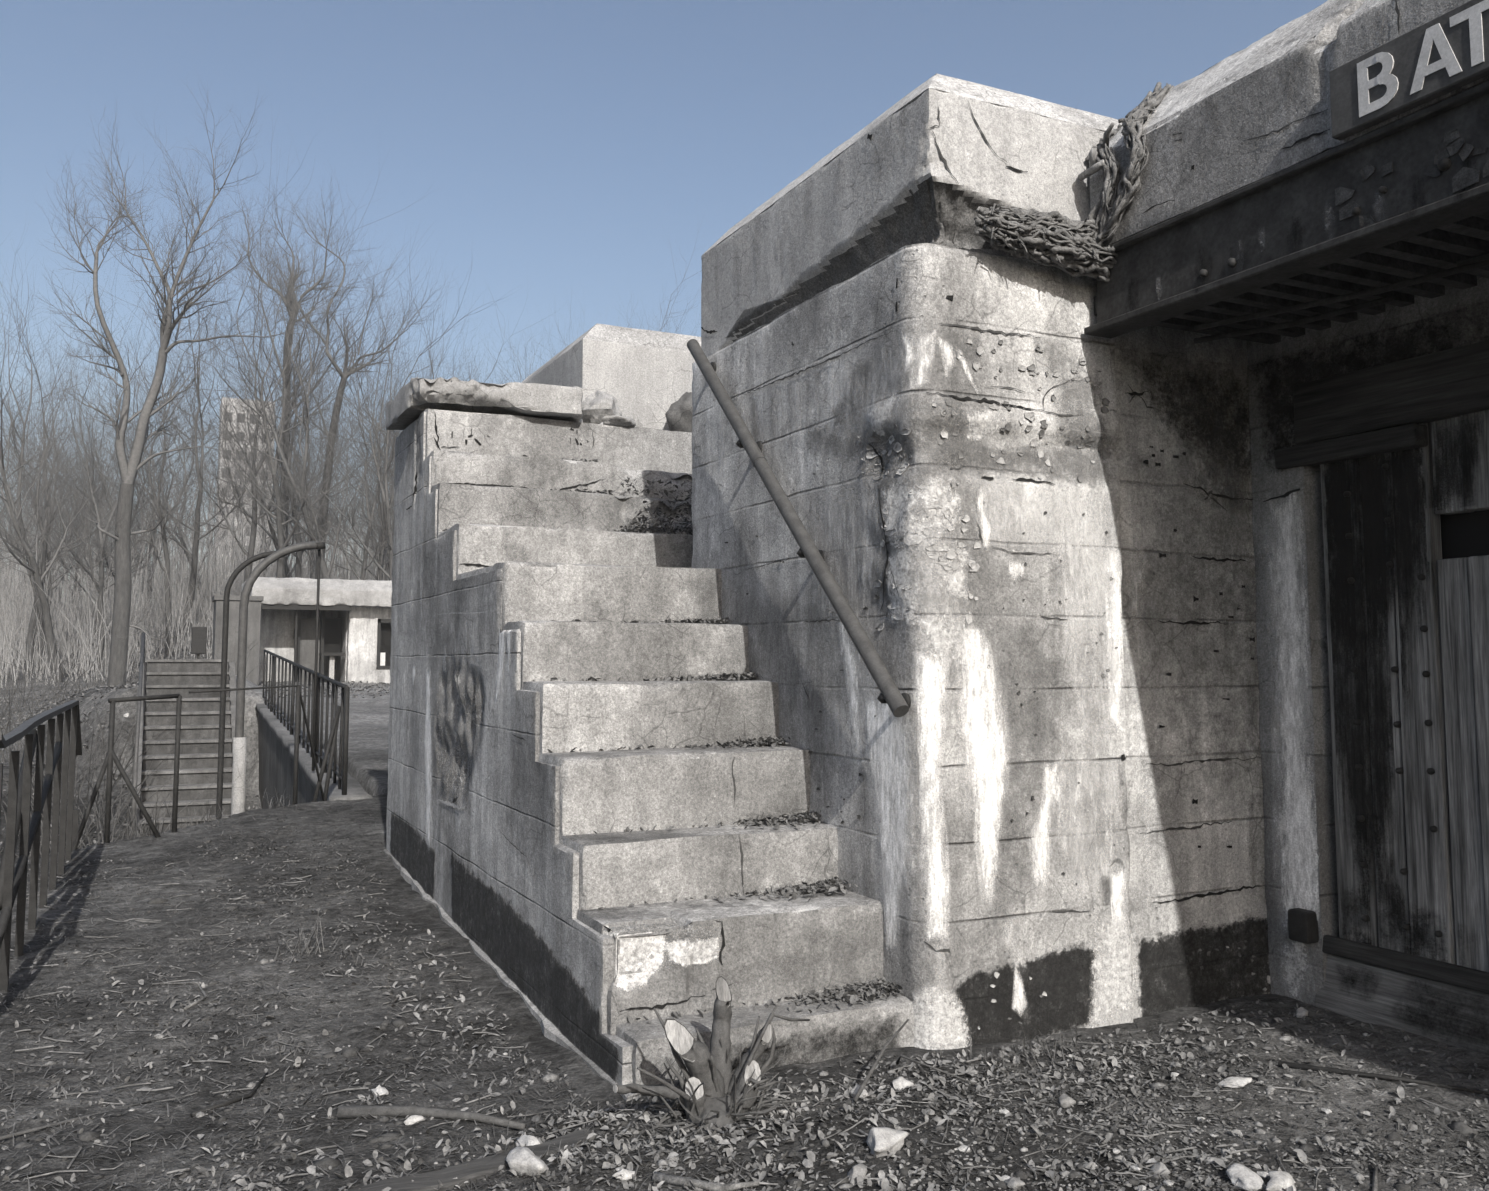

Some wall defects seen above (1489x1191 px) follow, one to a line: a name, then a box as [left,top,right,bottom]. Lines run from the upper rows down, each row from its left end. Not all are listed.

crack [1393,0,1401,32]
spalling [726,176,1026,342]
water stain [390,667,619,1081]
spalling [603,924,718,991]
crack [869,444,899,611]
water stain [841,615,1012,947]
water stain [978,493,1018,545]
water stain [1034,767,1059,880]
water stain [1063,511,1142,724]
water stain [956,867,1308,1047]
water stain [1270,493,1319,918]
water stain [1322,414,1481,963]